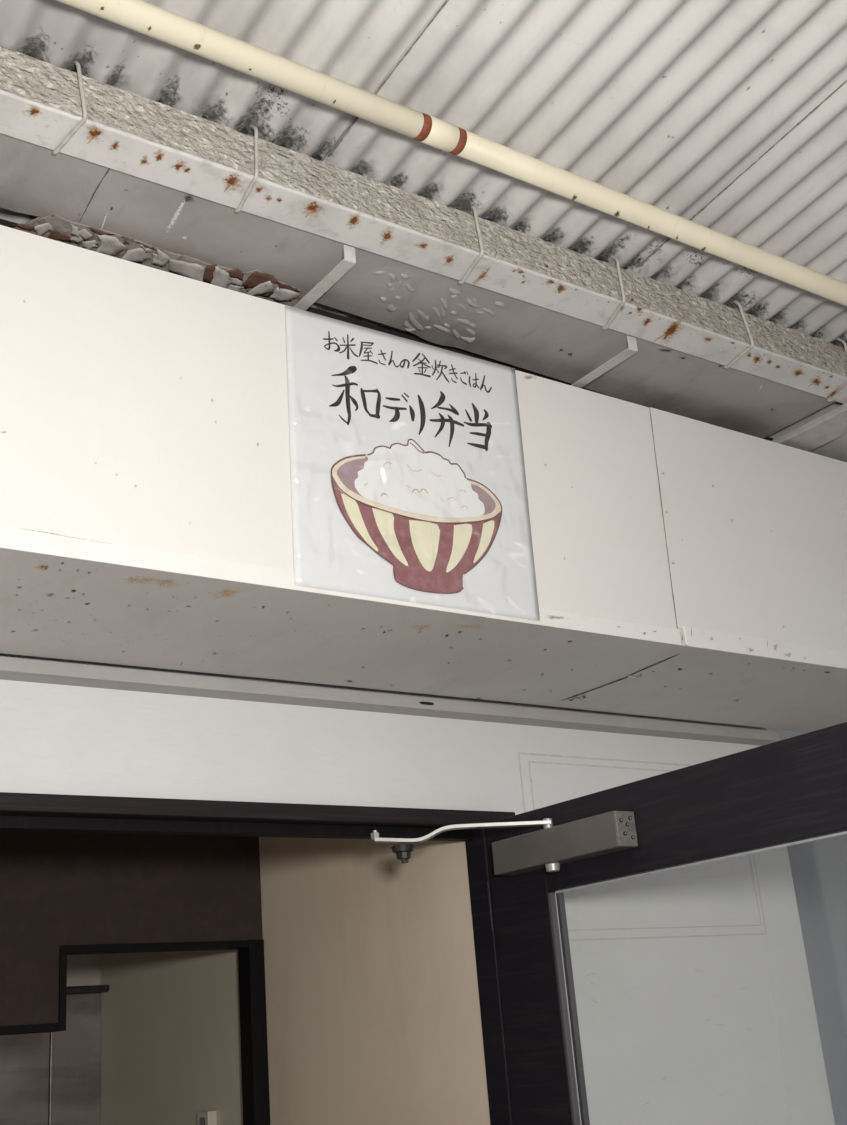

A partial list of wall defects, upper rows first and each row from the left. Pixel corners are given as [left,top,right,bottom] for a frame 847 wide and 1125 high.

water stain [23,38,62,62]
water stain [67,52,93,75]
water stain [238,68,330,161]
rust [413,113,432,141]
rust [449,127,467,155]
peeling [0,46,847,377]
water stain [449,192,484,211]
water stain [484,210,527,233]
water stain [571,237,628,262]
rust [597,298,684,341]
water stain [725,294,801,329]
rust [748,354,838,398]